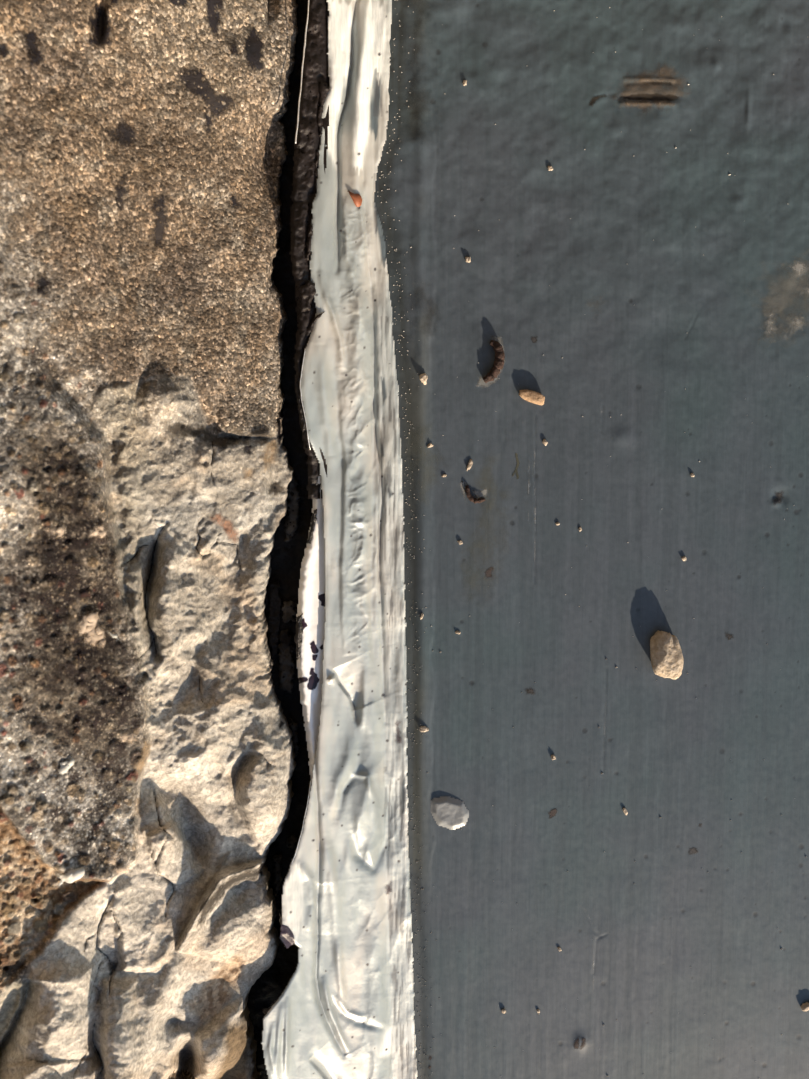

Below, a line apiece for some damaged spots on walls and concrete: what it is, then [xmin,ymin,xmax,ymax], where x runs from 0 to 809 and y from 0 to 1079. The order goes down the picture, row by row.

crack [151,793,174,892]